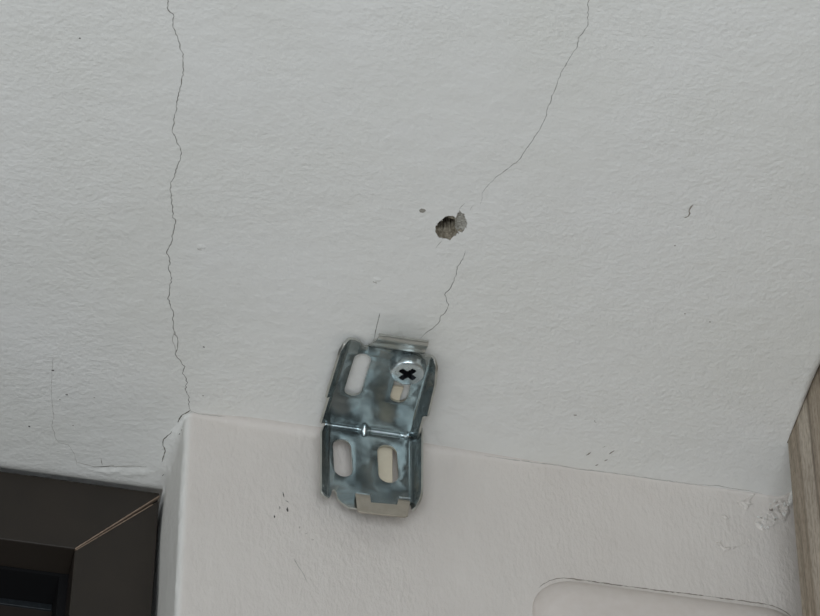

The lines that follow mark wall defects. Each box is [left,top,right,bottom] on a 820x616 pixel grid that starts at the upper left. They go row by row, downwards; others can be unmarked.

crack [460,1,589,210]
crack [162,1,225,476]
spalling [435,211,467,240]